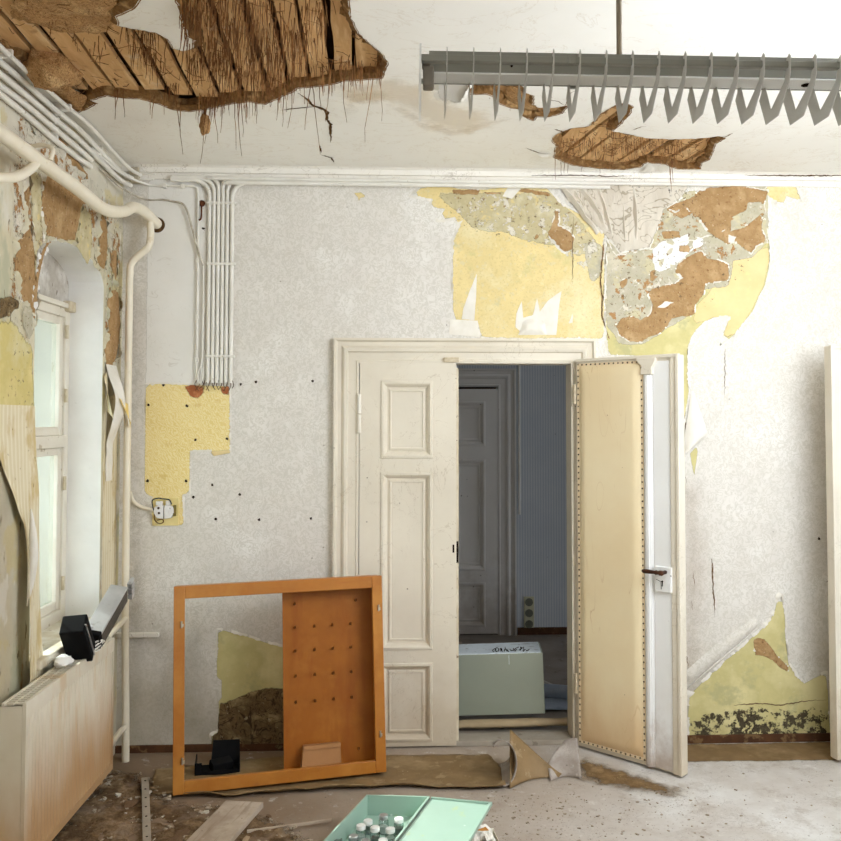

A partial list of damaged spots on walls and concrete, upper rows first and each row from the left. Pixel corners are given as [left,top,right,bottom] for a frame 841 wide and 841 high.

peeling [14,102,110,205]
crack [287,93,334,162]
peeling [0,171,123,406]
flaking render [440,186,769,345]
flaking render [753,638,789,671]
flaking render [212,688,284,750]
damp [690,700,828,735]